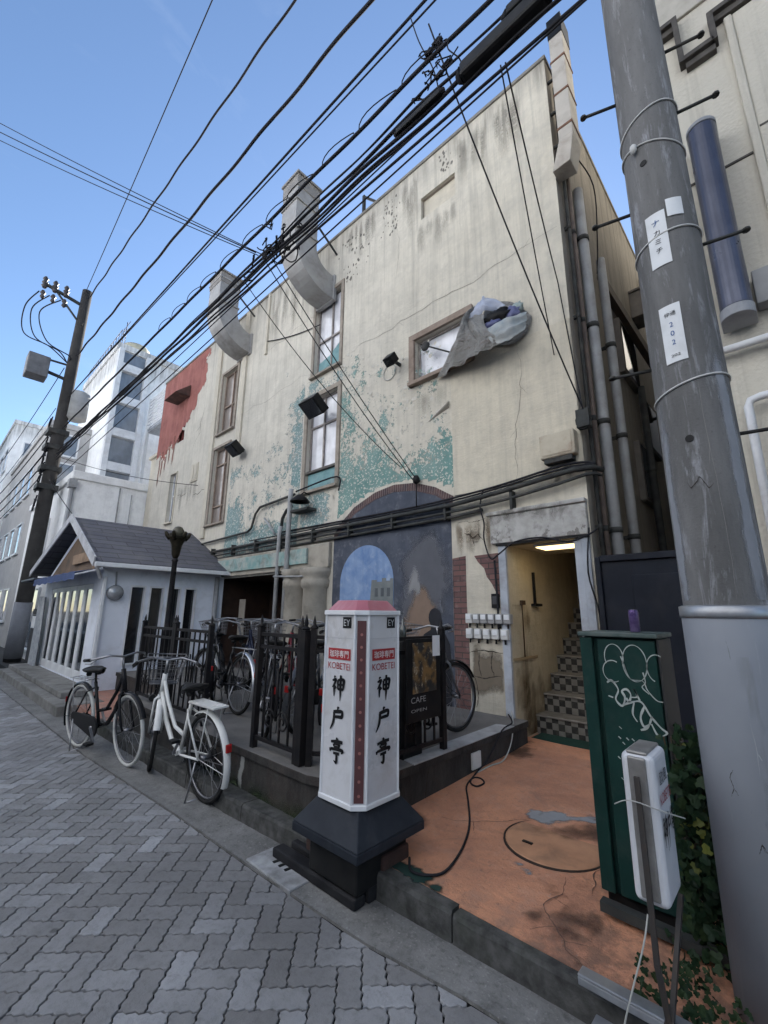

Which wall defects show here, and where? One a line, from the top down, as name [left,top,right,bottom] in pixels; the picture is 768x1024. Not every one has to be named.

peeling [156,348,211,485]
peeling [223,339,454,557]
crack [532,877,586,966]